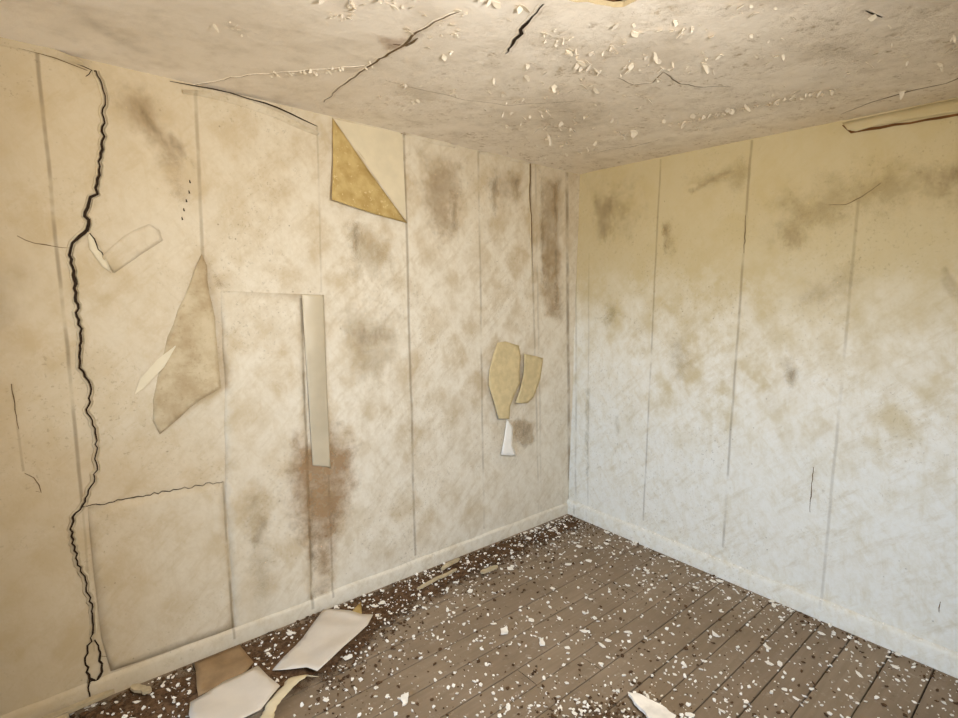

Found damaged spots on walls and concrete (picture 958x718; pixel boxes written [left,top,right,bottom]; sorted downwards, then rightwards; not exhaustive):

crack [170,11,571,126]
crack [502,3,544,54]
crack [18,48,221,697]